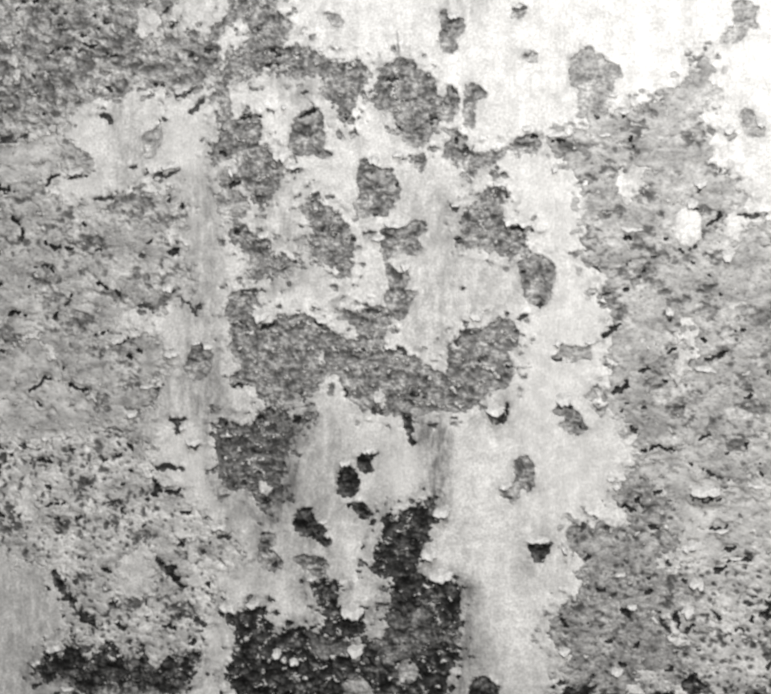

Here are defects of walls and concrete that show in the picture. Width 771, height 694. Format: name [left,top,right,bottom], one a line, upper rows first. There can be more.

peeling [0,117,216,452]
peeling [199,0,771,568]